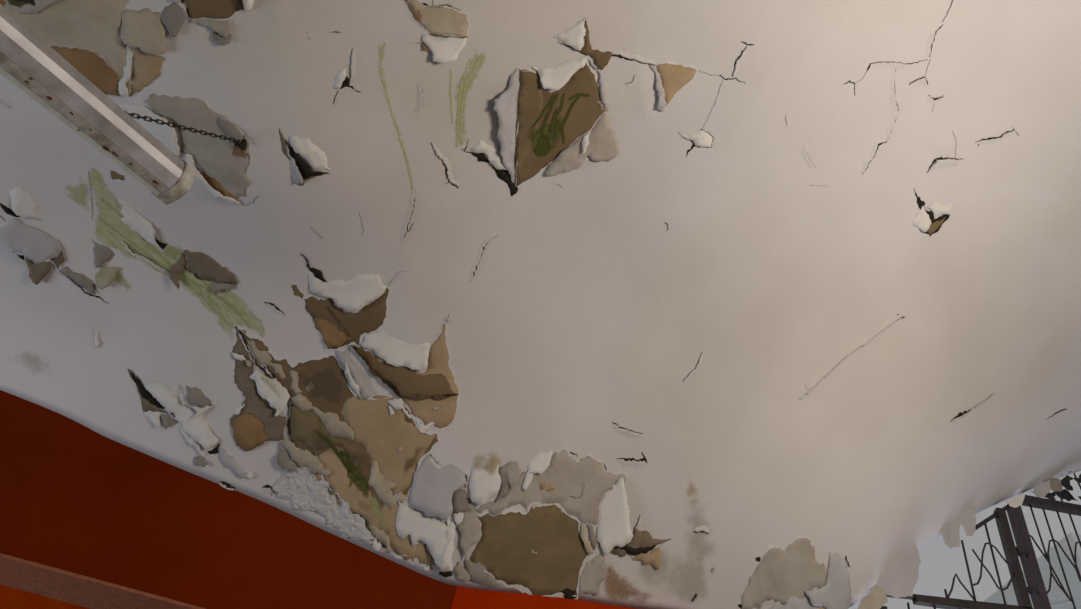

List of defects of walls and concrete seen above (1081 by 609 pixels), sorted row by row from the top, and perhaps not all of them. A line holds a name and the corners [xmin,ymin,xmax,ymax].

peeling [402,0,470,64]
peeling [51,0,259,206]
peeling [279,129,331,186]
peeling [462,18,698,196]
crack [844,0,956,175]
crack [927,129,1018,175]
peeling [0,186,122,304]
peeling [119,200,238,295]
peeling [912,189,953,236]
peeling [127,254,671,600]
crack [951,393,995,423]
peeling [738,535,921,609]